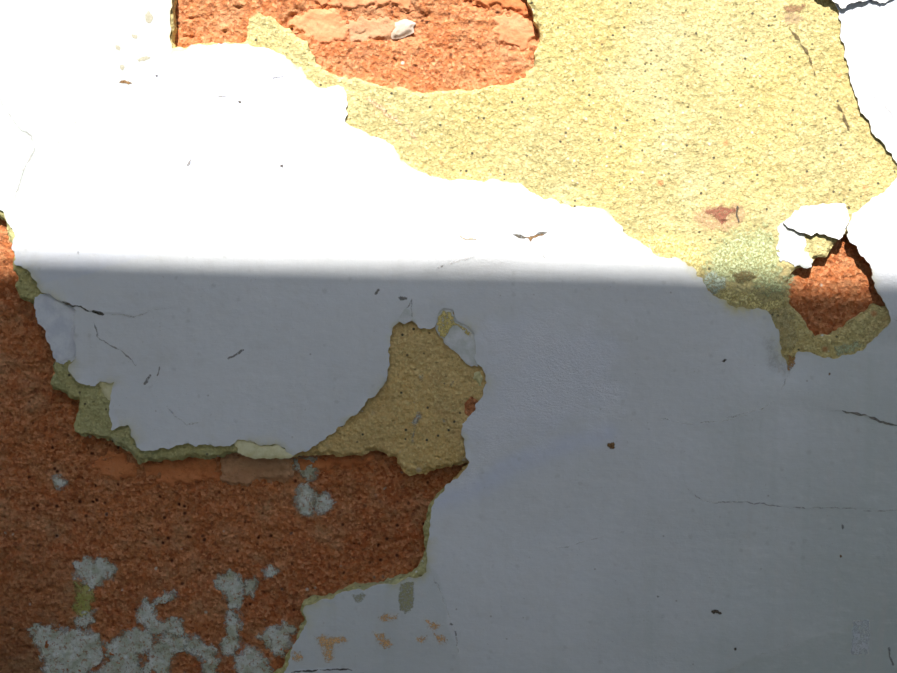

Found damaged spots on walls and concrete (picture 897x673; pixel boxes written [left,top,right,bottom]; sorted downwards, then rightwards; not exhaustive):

flaking render [170,0,897,365]
spalling [0,210,486,673]
crack [842,410,897,426]
crack [291,665,352,673]